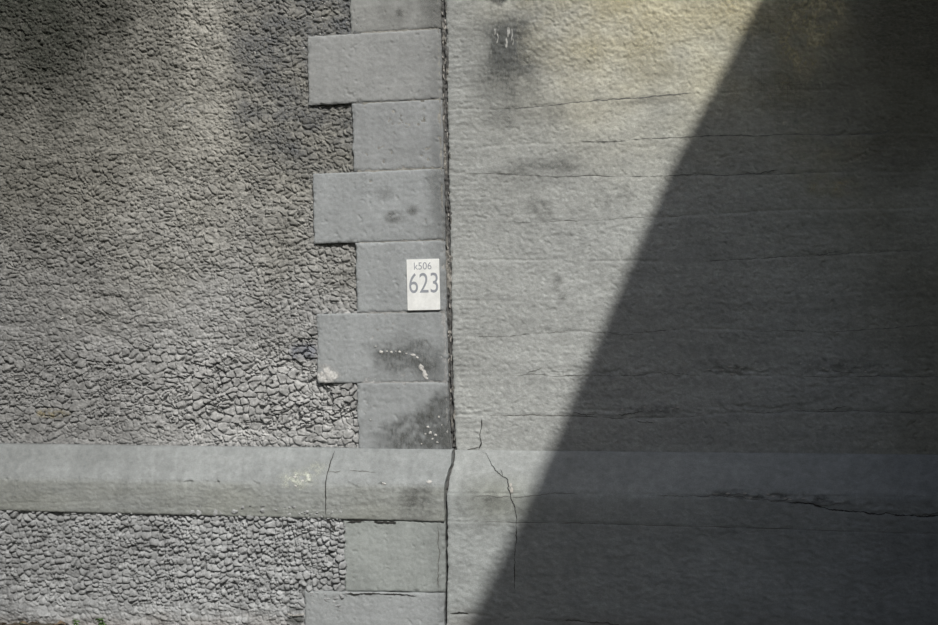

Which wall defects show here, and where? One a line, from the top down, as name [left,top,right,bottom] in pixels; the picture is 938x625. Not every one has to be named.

leakage [489,22,530,92]
crack [325,451,403,530]
crack [467,411,703,589]
crack [660,492,938,534]
crack [437,521,458,586]